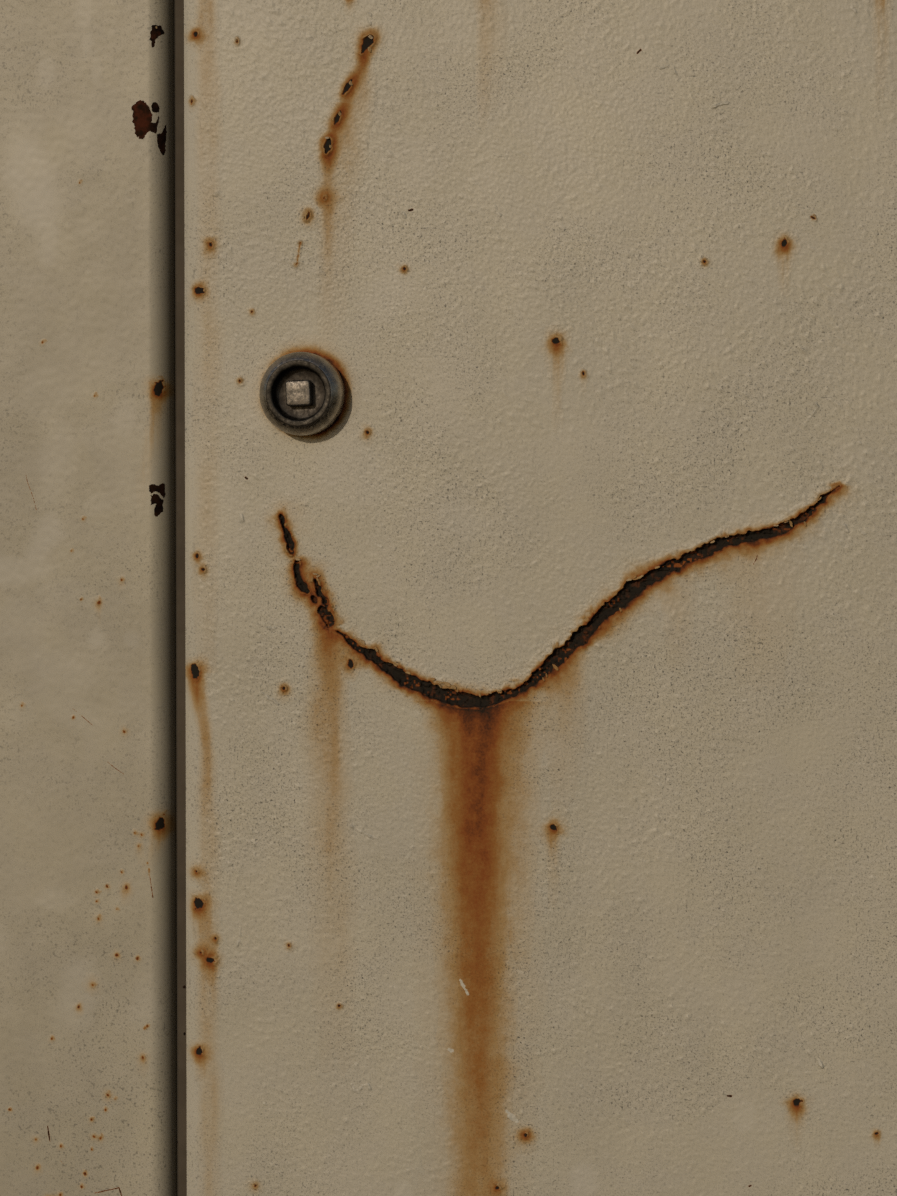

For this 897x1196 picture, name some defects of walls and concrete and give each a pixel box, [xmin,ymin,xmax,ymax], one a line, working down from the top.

peeling [149,25,164,47]
peeling [131,100,167,155]
corrosion [233,334,379,447]
corrosion [536,322,592,433]
peeling [149,483,166,517]
crack [260,463,866,713]
corrosion [185,654,214,724]
corrosion [91,803,177,907]
corrosion [272,619,362,1076]
corrosion [186,856,227,988]
corrosion [403,649,591,1196]
corrosion [777,1088,817,1155]